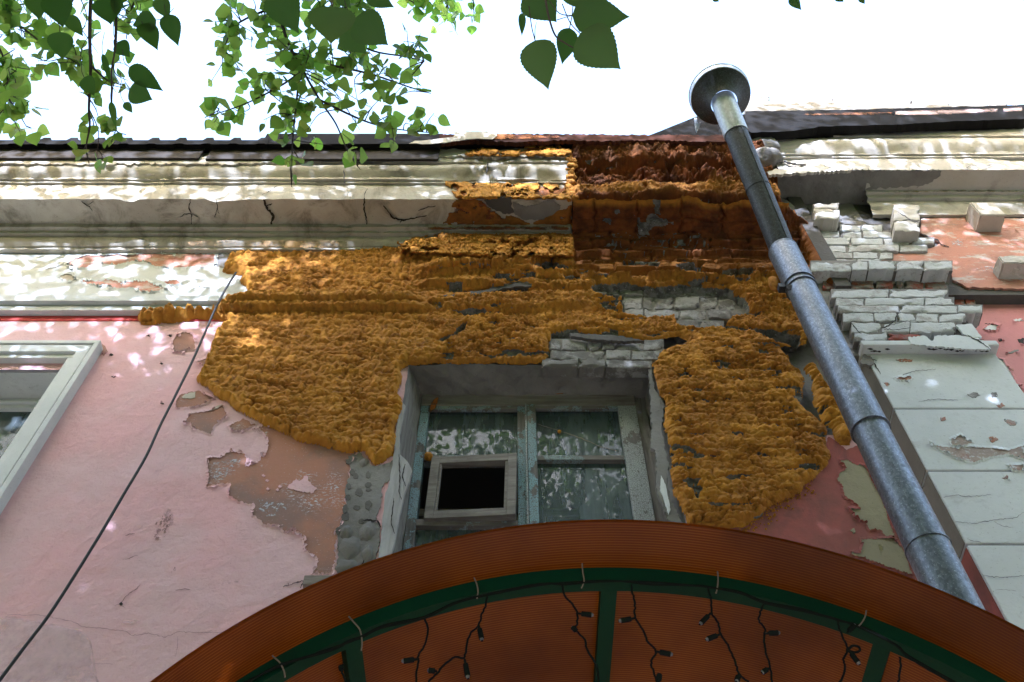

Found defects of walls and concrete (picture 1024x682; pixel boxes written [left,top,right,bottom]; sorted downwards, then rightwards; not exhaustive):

spalling [0,156,305,168]
crack [262,186,276,224]
crack [343,170,435,224]
spalling [439,141,767,250]
peeling [58,251,230,294]
spalling [809,224,1024,390]
peeling [167,330,207,368]
spalling [541,289,746,523]
peeling [160,388,393,575]
peeling [929,433,1024,480]
flaking render [730,437,918,581]